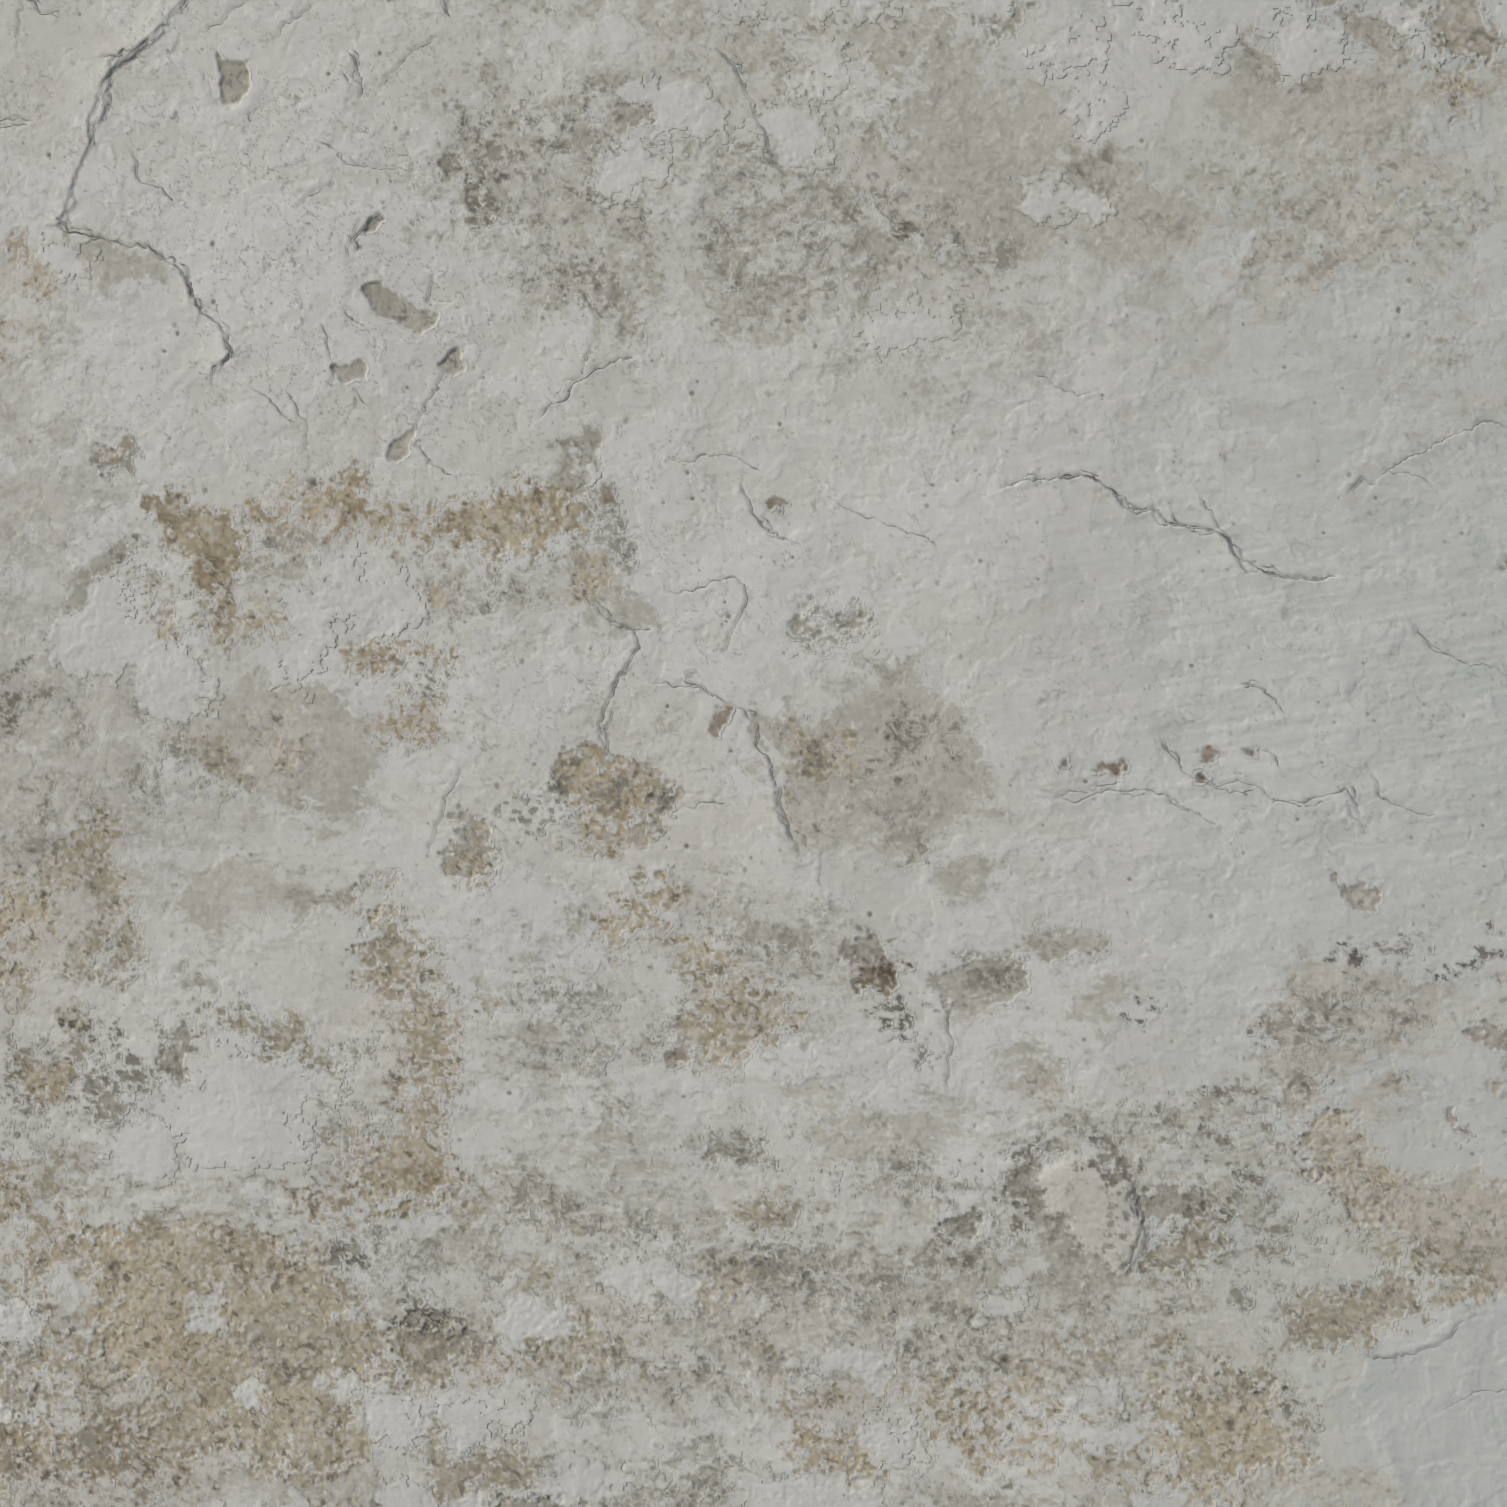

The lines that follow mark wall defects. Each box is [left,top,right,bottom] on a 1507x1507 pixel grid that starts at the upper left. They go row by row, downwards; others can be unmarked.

peeling [214,51,252,107]
crack [342,0,449,97]
crack [57,0,365,451]
peeling [360,0,1507,386]
crack [1002,470,1334,581]
crack [666,575,747,651]
crack [577,591,806,849]
water stain [829,923,944,1072]
water stain [1233,904,1506,1070]
water stain [532,1090,782,1192]
water stain [829,1121,971,1249]
water stain [1037,1076,1441,1364]